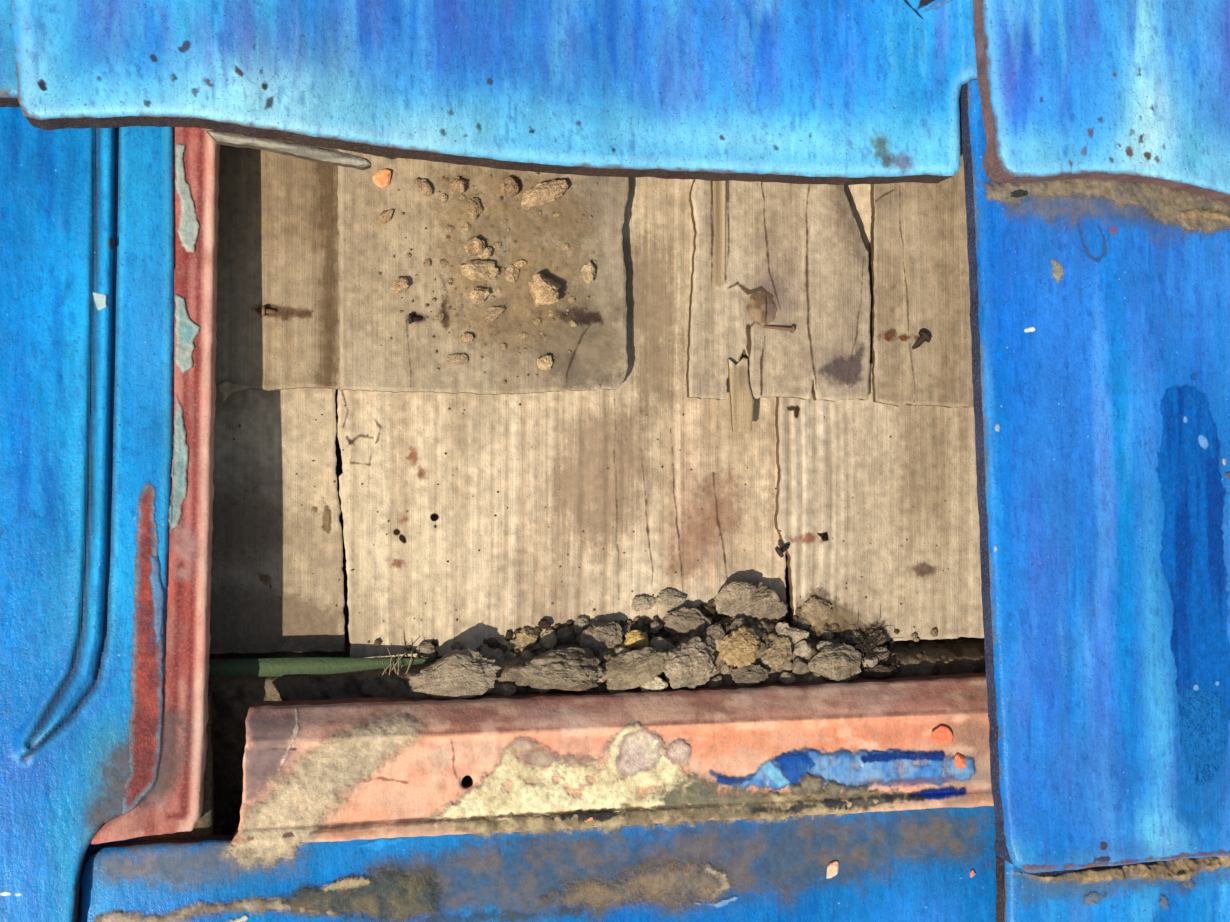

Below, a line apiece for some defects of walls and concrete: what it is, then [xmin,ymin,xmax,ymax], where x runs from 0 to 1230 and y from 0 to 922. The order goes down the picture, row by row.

peeling [174,294,200,373]
leakage [821,347,864,384]
peeling [169,398,188,532]
leakage [1157,374,1230,831]
peeling [931,726,966,769]